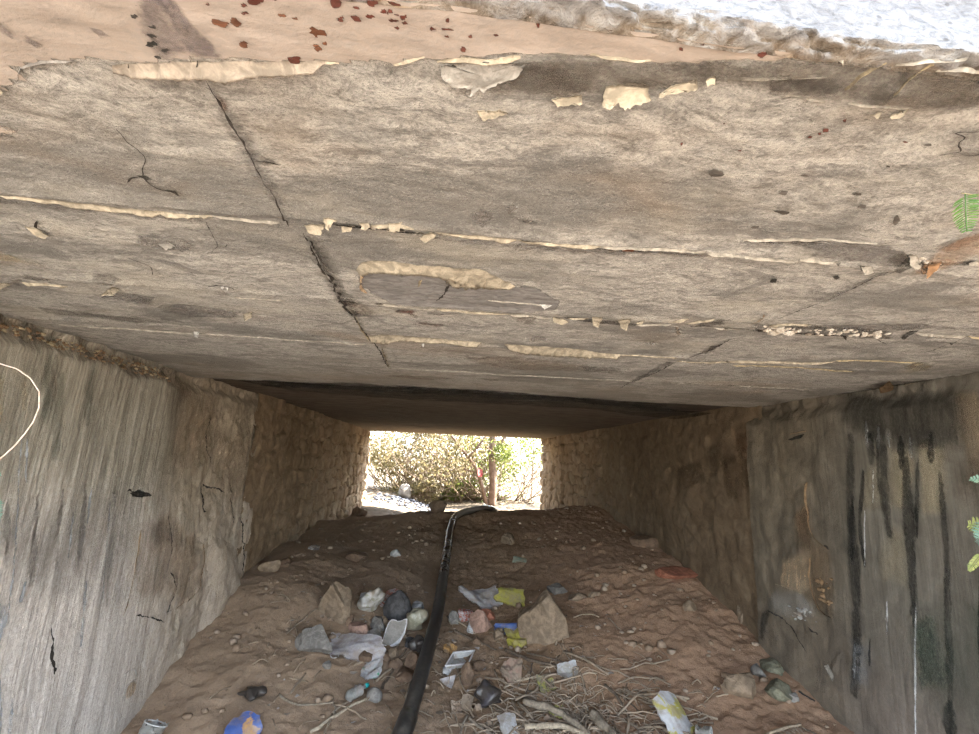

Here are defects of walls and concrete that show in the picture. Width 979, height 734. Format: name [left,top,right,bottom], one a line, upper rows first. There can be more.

rust [211,0,277,28]
rust [309,27,327,52]
rust [330,0,408,30]
peeling [0,0,979,119]
peeling [477,109,508,121]
crack [117,130,179,196]
crack [206,81,389,368]
peeling [304,218,943,279]
peeling [356,261,979,340]
water stain [846,394,957,734]
crack [49,627,57,675]